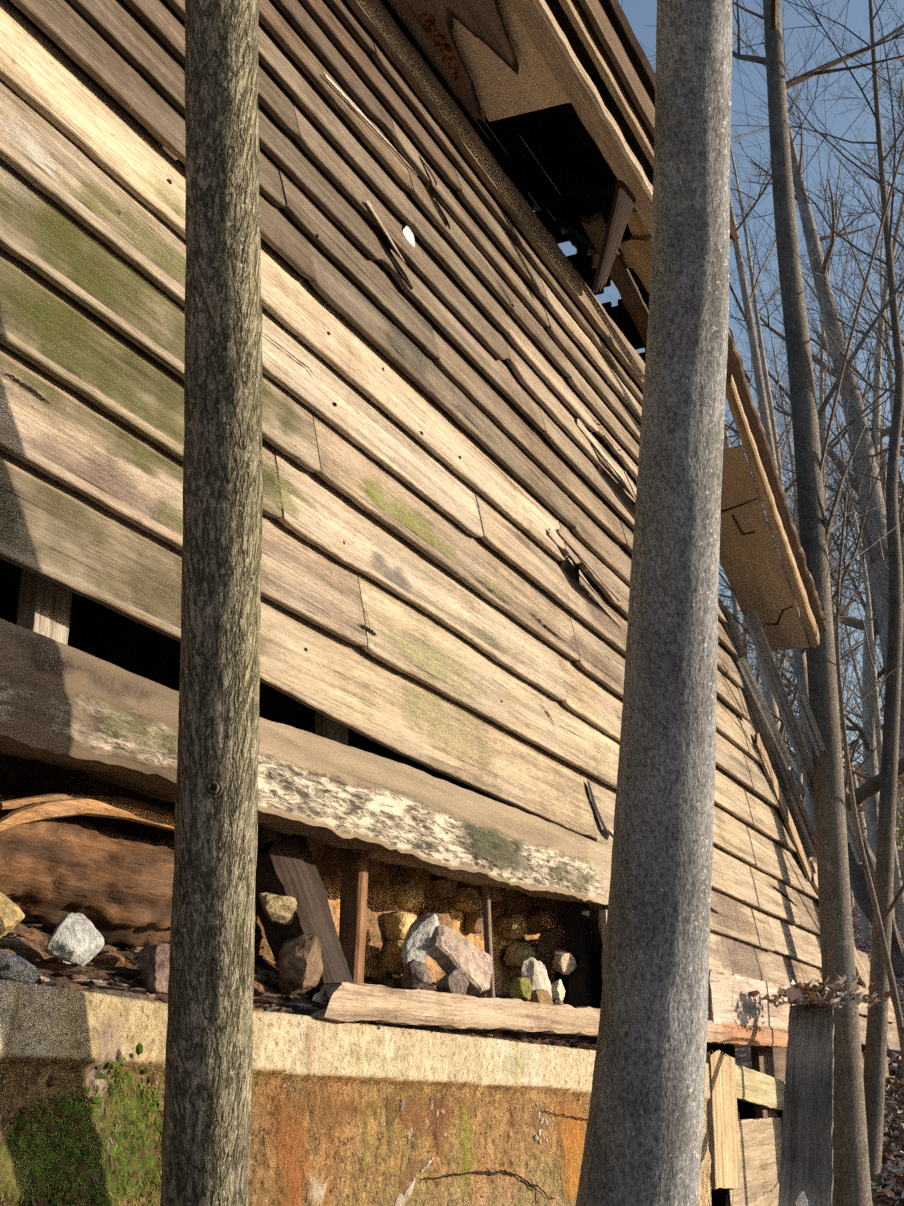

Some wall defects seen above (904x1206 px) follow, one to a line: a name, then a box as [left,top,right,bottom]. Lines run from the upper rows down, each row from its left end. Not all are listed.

crack [423,1170,556,1203]
rust [559,1117,584,1197]